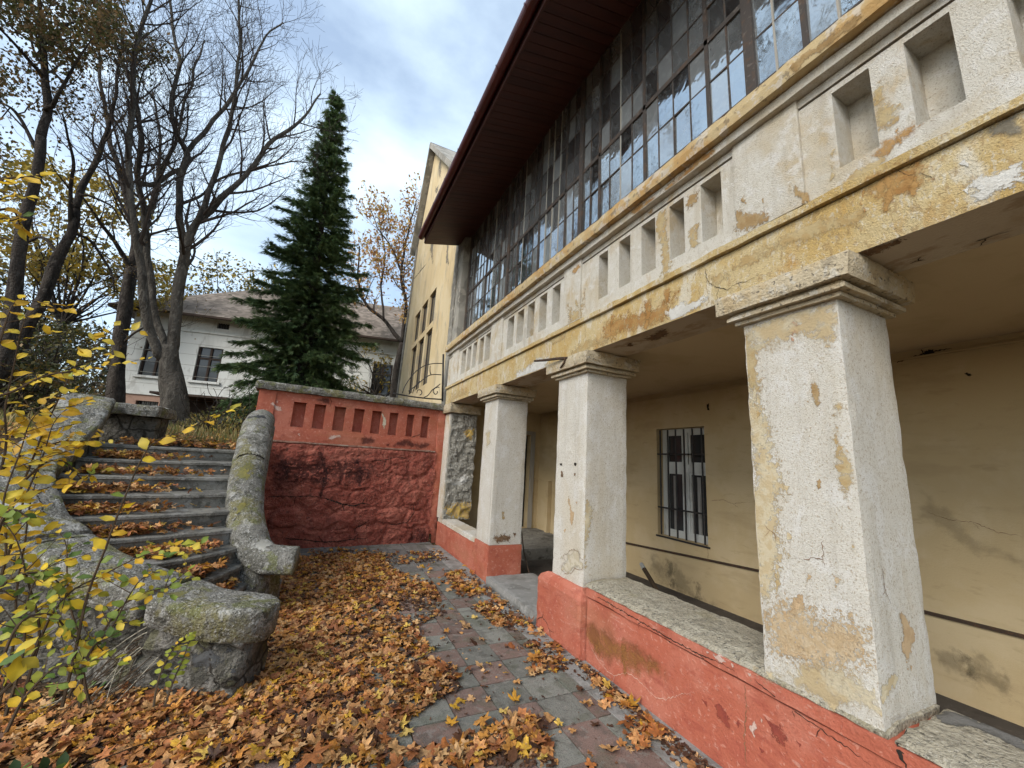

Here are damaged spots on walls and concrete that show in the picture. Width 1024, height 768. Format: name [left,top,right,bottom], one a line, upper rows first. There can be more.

peeling [959,160,1024,202]
peeling [628,294,709,347]
peeling [443,500,471,519]
peeling [746,332,876,681]
crack [896,729,907,768]